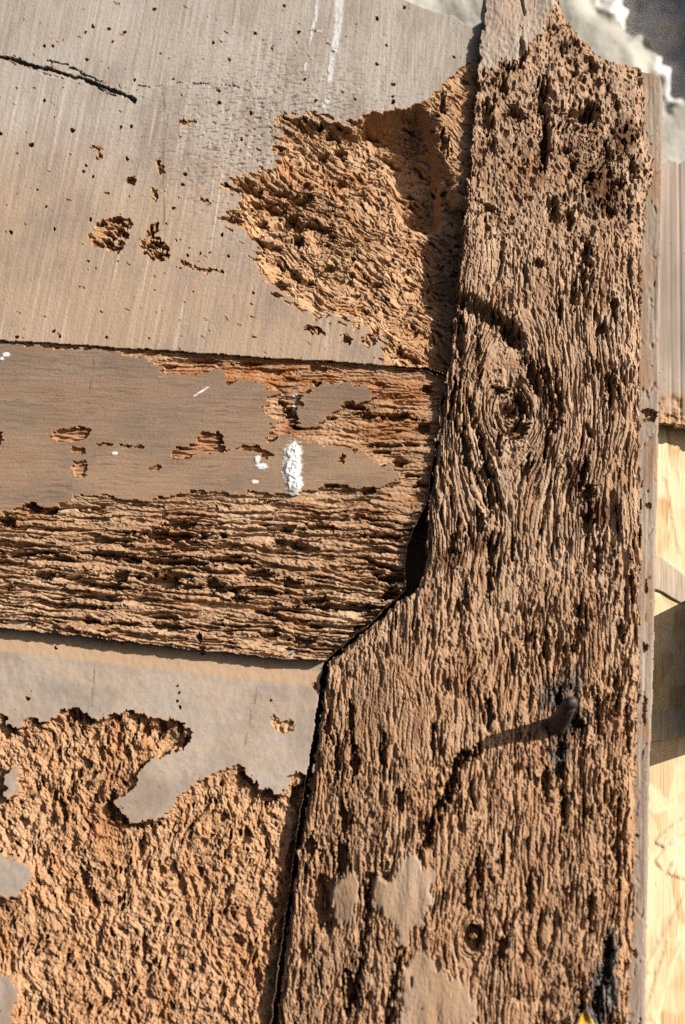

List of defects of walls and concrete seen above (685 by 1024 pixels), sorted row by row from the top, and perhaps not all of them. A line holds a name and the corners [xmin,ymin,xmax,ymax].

spalling [8,35,142,172]
crack [0,54,243,105]
spalling [0,57,483,691]
spalling [0,672,307,1024]